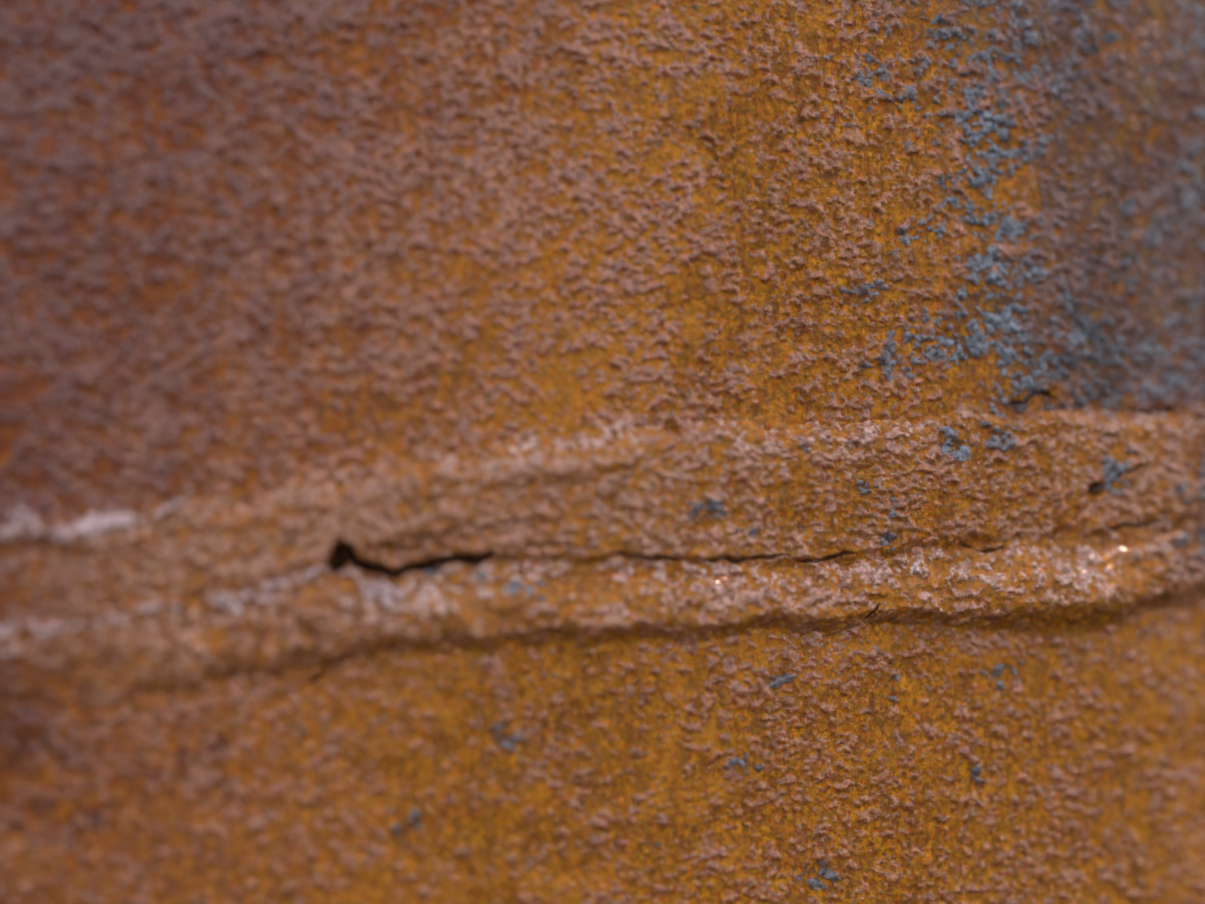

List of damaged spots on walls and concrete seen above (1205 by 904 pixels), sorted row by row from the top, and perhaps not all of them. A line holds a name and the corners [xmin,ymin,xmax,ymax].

corrosion [630,0,1141,575]
corrosion [0,487,195,543]
crack [352,516,854,578]
corrosion [0,601,186,639]
corrosion [207,565,404,616]
corrosion [338,538,1205,904]